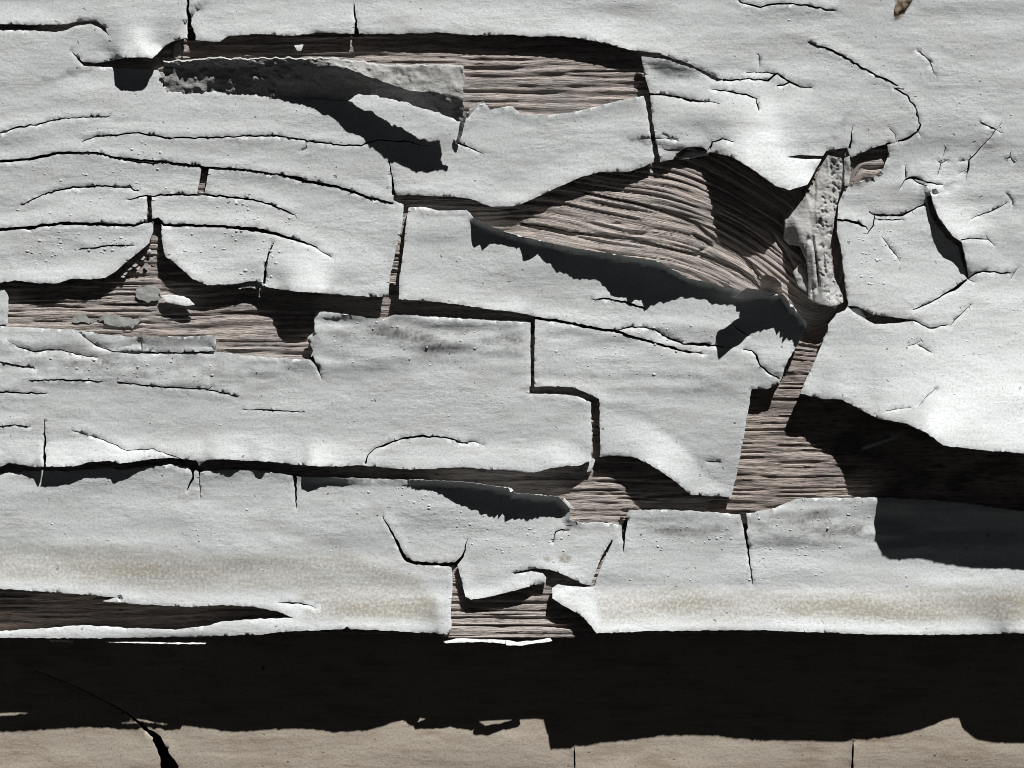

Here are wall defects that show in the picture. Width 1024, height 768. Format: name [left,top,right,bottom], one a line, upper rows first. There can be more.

peeling [72,22,722,142]
crack [641,72,807,149]
crack [808,42,921,146]
crack [0,116,426,286]
crack [521,192,761,289]
crack [837,125,1009,352]
crack [0,332,300,412]
peeling [0,140,1024,531]
crack [365,434,483,464]
crack [383,517,468,566]
peeling [442,540,613,637]
crack [40,672,179,768]